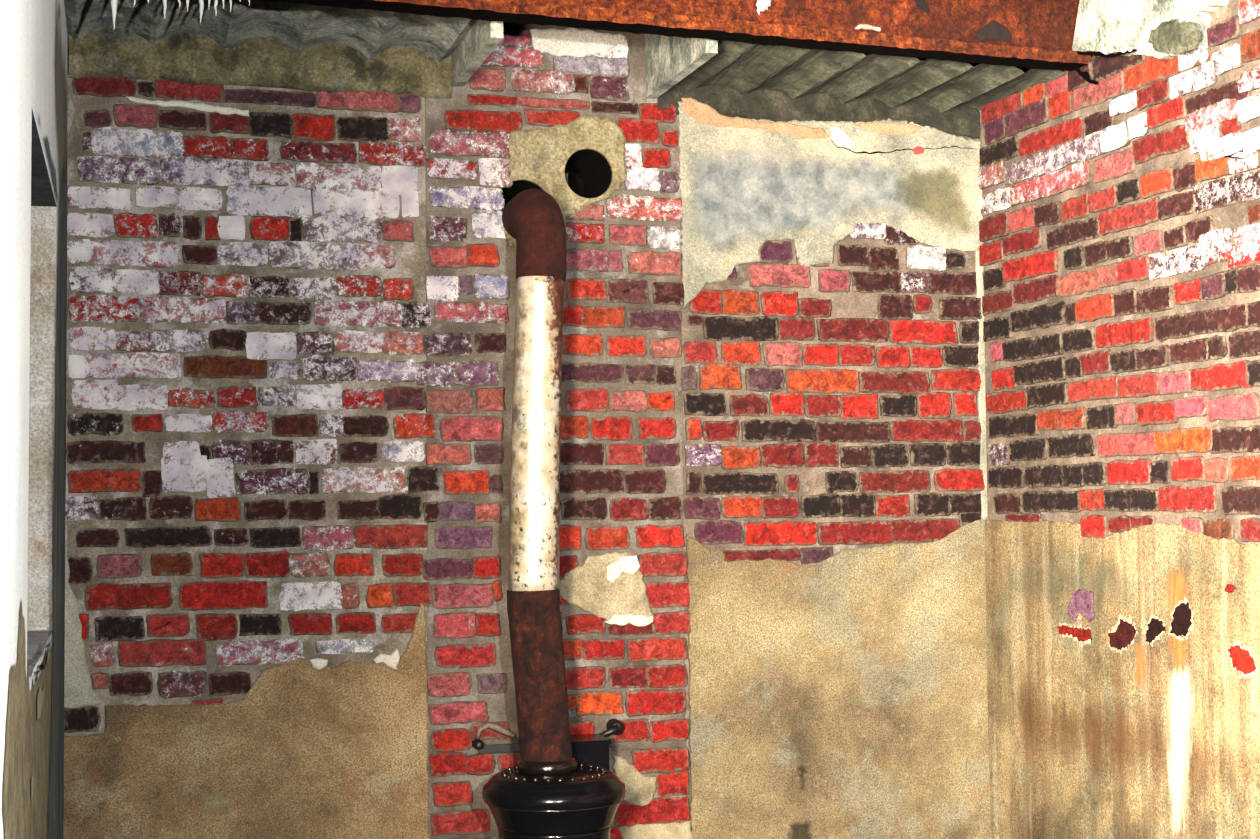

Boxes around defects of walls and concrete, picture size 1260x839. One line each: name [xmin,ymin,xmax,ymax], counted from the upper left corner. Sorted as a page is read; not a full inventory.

rust [914,0,930,13]
rust [976,20,1012,42]
leakage [566,144,966,262]
flaking render [680,0,1260,581]
leakage [978,90,1147,216]
leakage [1149,223,1260,280]
leakage [1169,33,1260,213]
flaking render [3,76,440,839]
leakage [30,10,510,839]
peeling [607,555,640,583]
peeling [604,614,654,626]
flaking render [1108,598,1195,654]